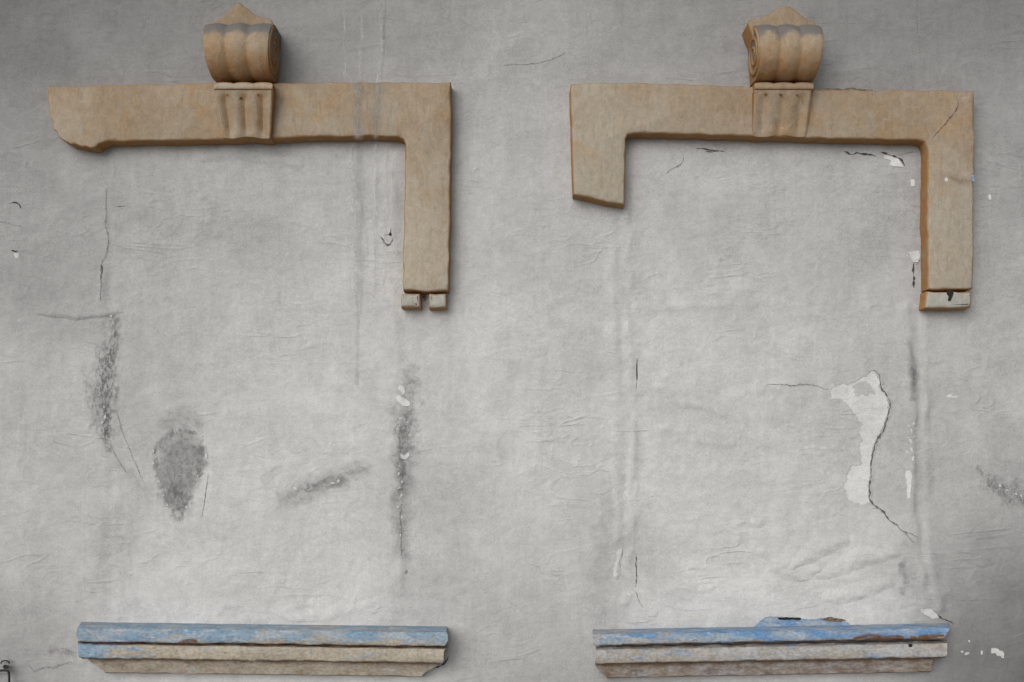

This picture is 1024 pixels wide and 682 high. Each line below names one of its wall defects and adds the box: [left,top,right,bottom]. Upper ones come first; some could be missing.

crack [843,100,959,168]
crack [100,189,123,301]
damp [100,351,208,514]
damp [396,452,410,556]
damp [396,385,411,436]
flaking render [826,367,894,509]
crack [869,370,916,541]